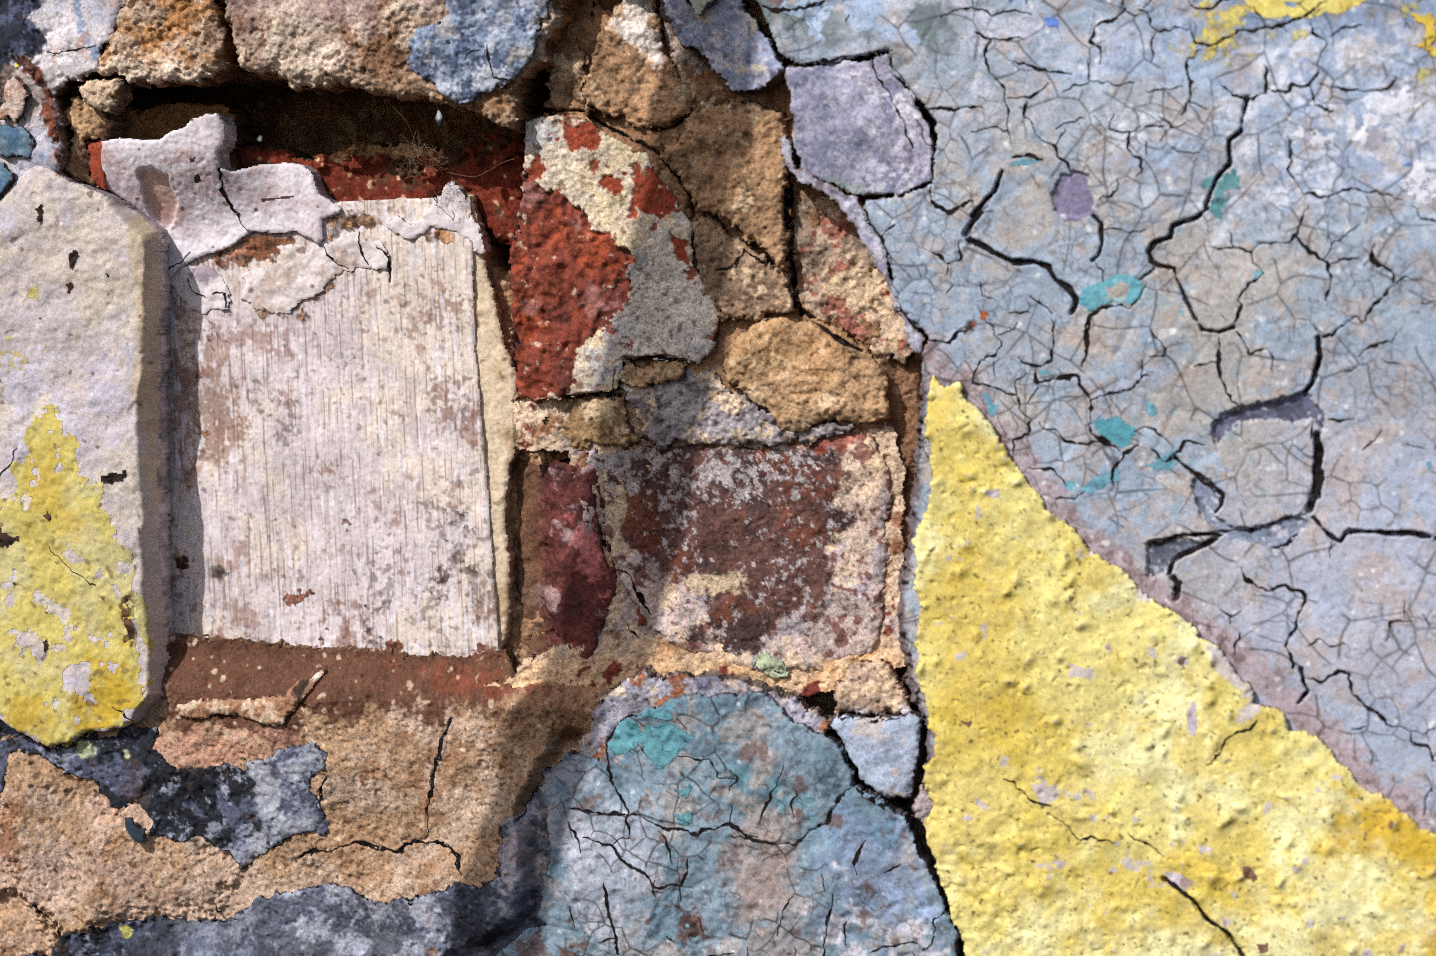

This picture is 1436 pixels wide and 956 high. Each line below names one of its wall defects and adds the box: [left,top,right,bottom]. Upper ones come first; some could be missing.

peeling [1044,17,1058,27]
peeling [0,124,36,196]
peeling [171,231,390,314]
crack [716,185,861,352]
crack [761,0,1436,597]
spalling [515,458,618,659]
flaking render [753,651,790,679]
crack [1219,567,1436,815]
peeling [25,760,562,956]
crack [298,717,462,876]
crack [568,708,949,956]
crack [1003,778,1245,956]